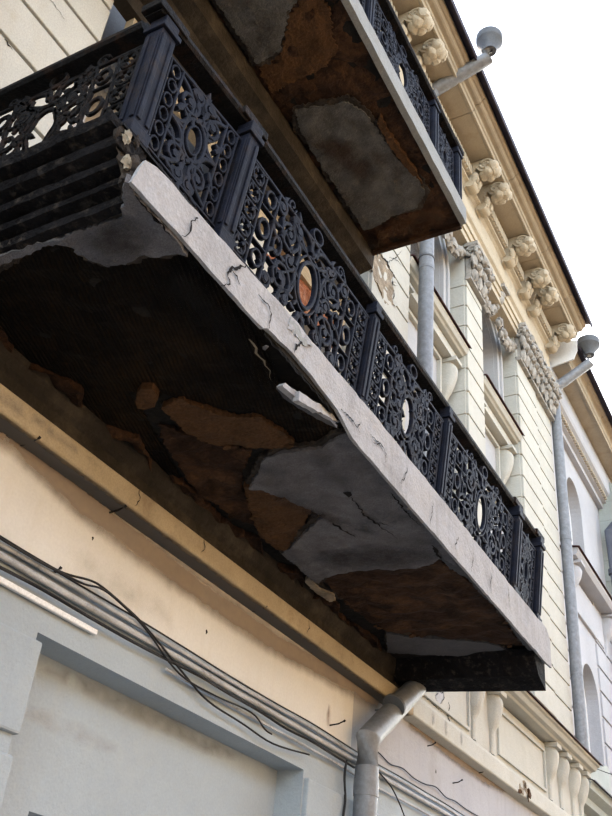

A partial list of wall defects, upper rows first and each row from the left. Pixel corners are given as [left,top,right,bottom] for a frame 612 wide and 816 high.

spalling [113,122,141,194]
peeling [212,0,459,306]
crack [221,264,248,286]
spalling [0,245,340,555]
crack [351,497,393,535]
crack [392,468,433,526]
peeling [313,559,522,651]